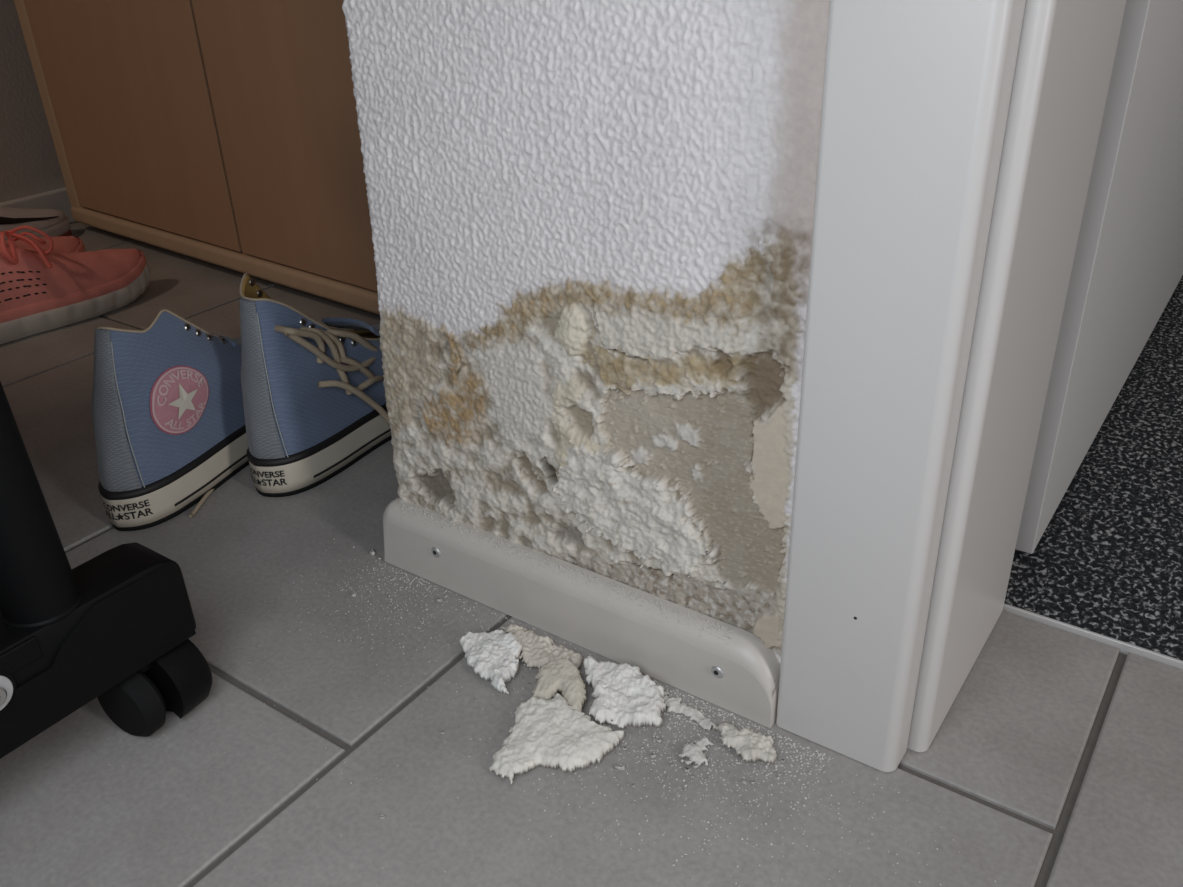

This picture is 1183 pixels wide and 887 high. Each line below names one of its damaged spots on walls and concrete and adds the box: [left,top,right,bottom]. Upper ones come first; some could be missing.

flaking render [379,231,803,654]